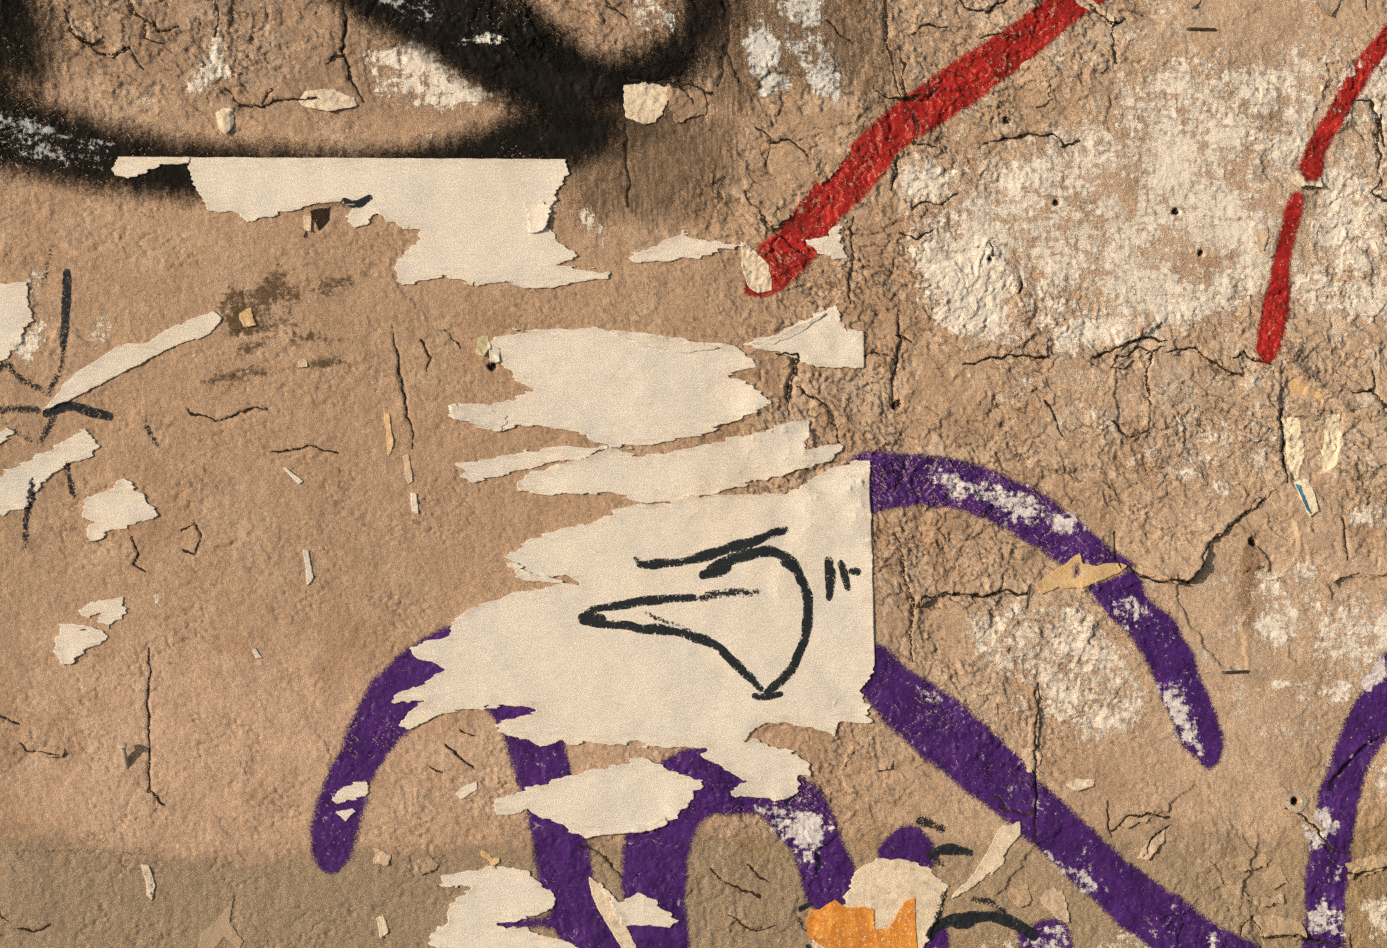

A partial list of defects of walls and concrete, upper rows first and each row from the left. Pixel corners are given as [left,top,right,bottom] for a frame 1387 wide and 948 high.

crack [224,0,365,108]
peeling [380,0,434,20]
peeling [811,137,852,186]
crack [826,0,1019,240]
crack [1355,99,1387,202]
peeling [741,241,772,293]
crack [1090,336,1273,439]
peeling [1281,340,1360,517]
crack [1113,408,1289,584]
crack [894,534,1028,663]
peeling [1229,851,1346,948]
peeling [1345,854,1387,880]